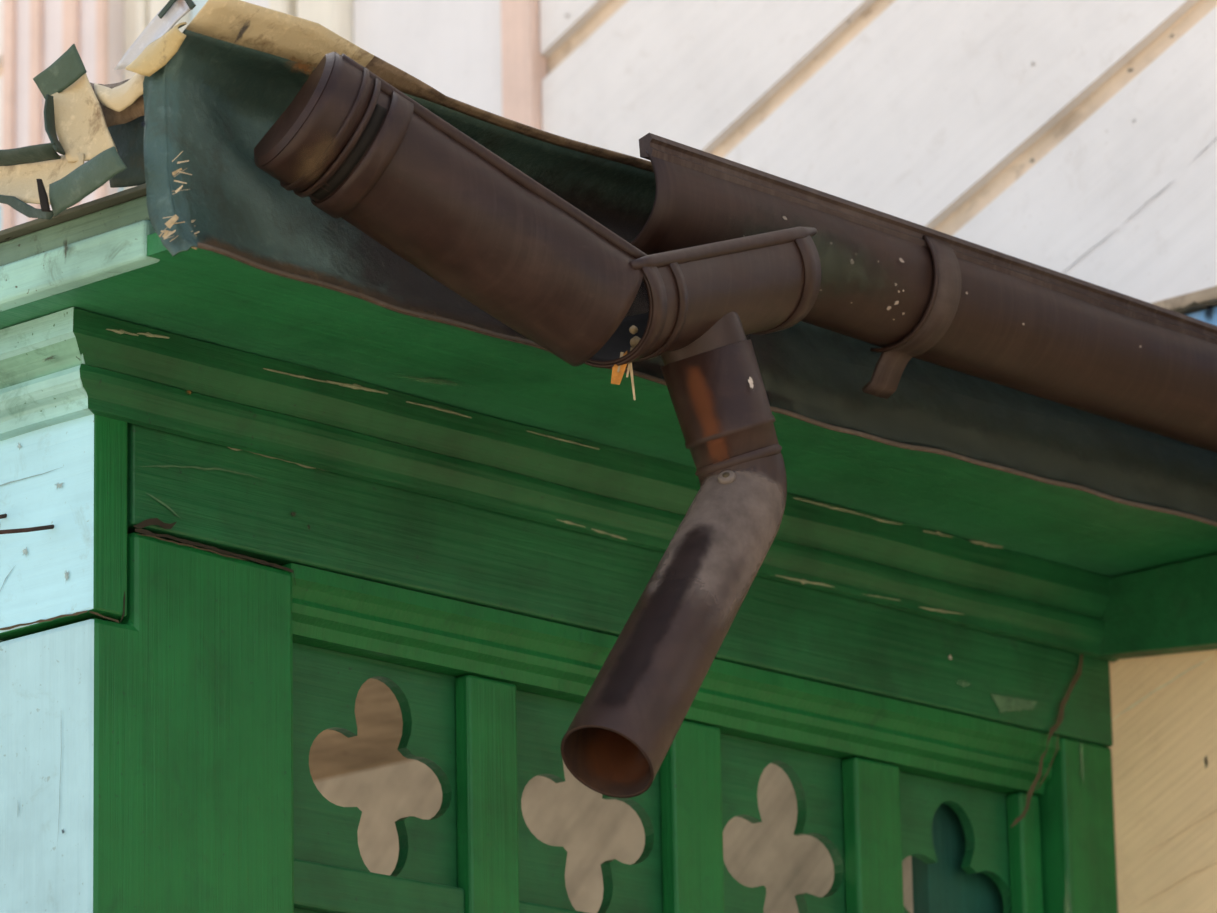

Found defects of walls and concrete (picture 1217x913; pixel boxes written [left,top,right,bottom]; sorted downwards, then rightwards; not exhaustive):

peeling [263,368,388,394]
peeling [406,401,472,418]
peeling [527,431,599,450]
crack [134,447,325,585]
peeling [793,497,902,525]
peeling [556,519,627,540]
peeling [776,575,835,587]
peeling [991,694,1038,713]
crack [1010,654,1083,828]